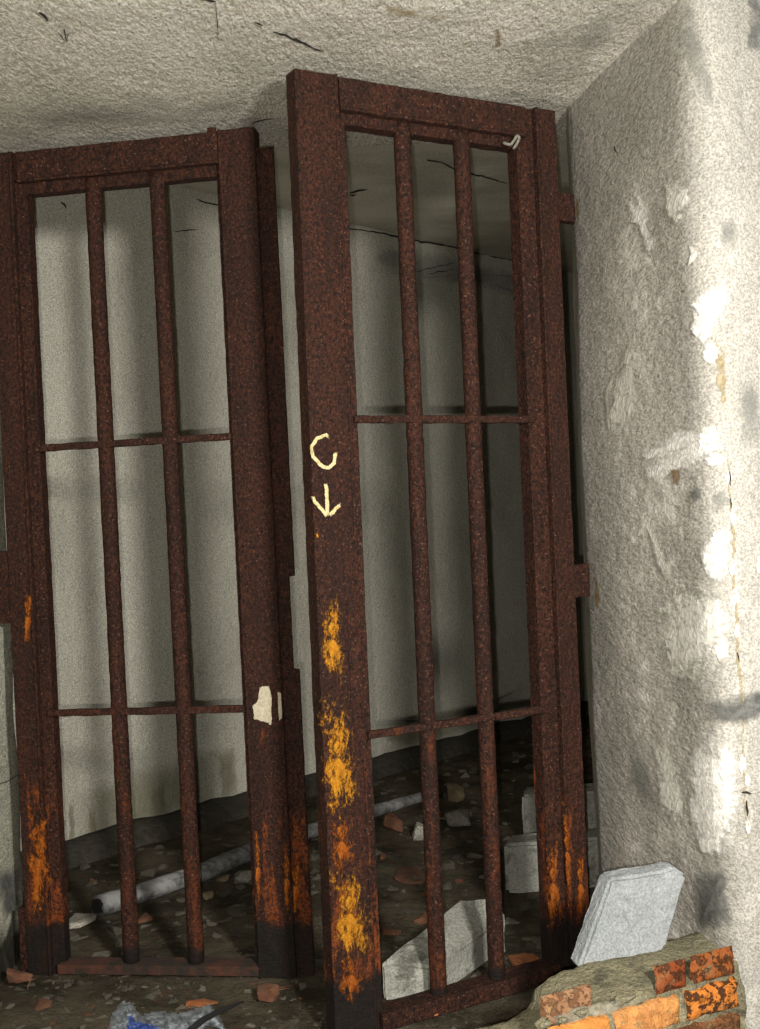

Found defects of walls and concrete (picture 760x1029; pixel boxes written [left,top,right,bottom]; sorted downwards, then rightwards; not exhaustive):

crack [254,22,323,52]
corrosion [27,805,52,912]
corrosion [322,701,370,1004]
spalling [535,992,636,1029]